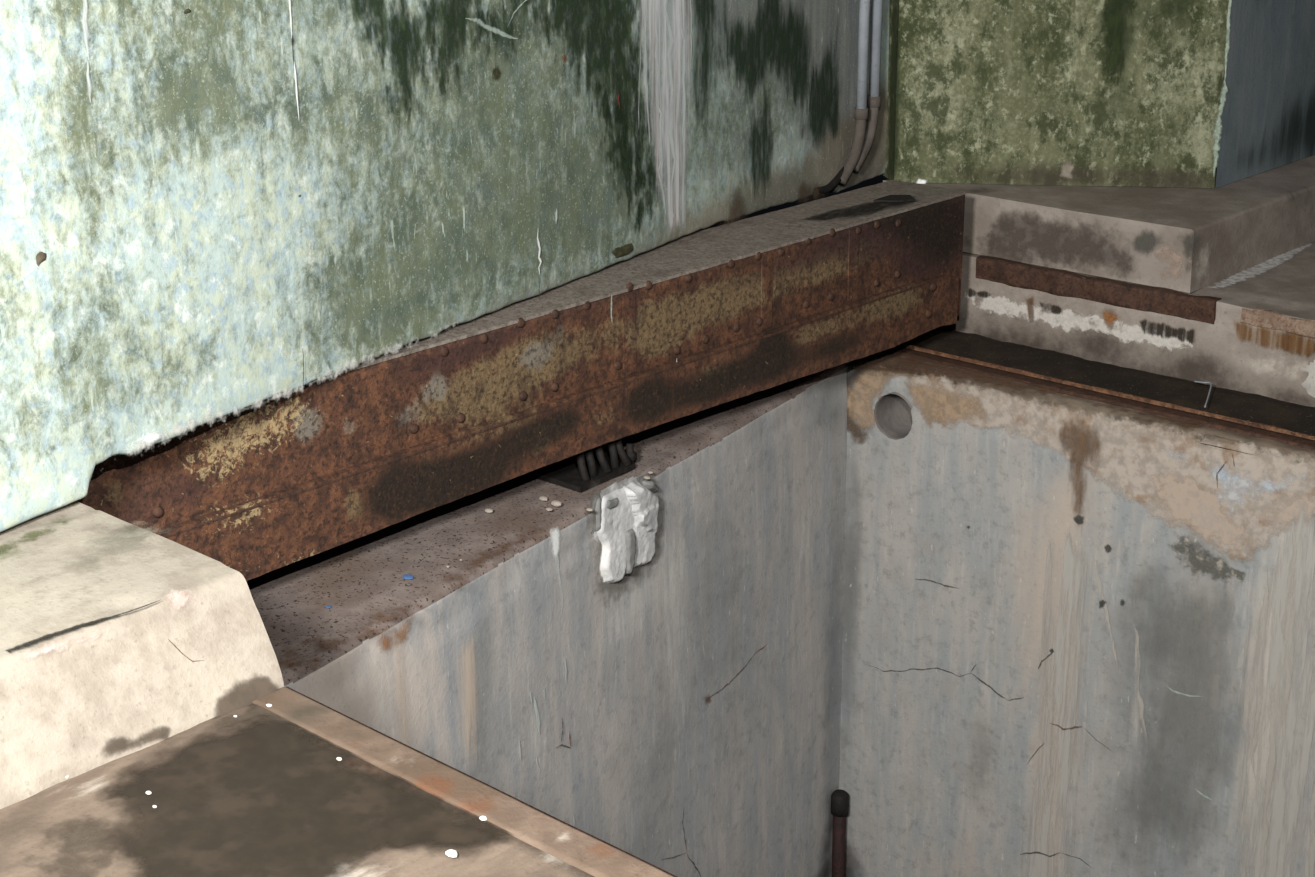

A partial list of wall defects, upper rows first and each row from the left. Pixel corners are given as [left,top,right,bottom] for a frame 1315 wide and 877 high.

leakage [82,0,91,102]
leakage [426,0,493,94]
leakage [596,0,692,229]
rust [976,255,1221,324]
rust [867,354,1051,394]
spalling [131,407,237,454]
rust [1060,426,1099,512]
spalling [246,328,1315,877]
crack [706,644,767,702]
crack [872,665,1024,701]
leakage [43,677,507,877]
crack [663,806,701,877]